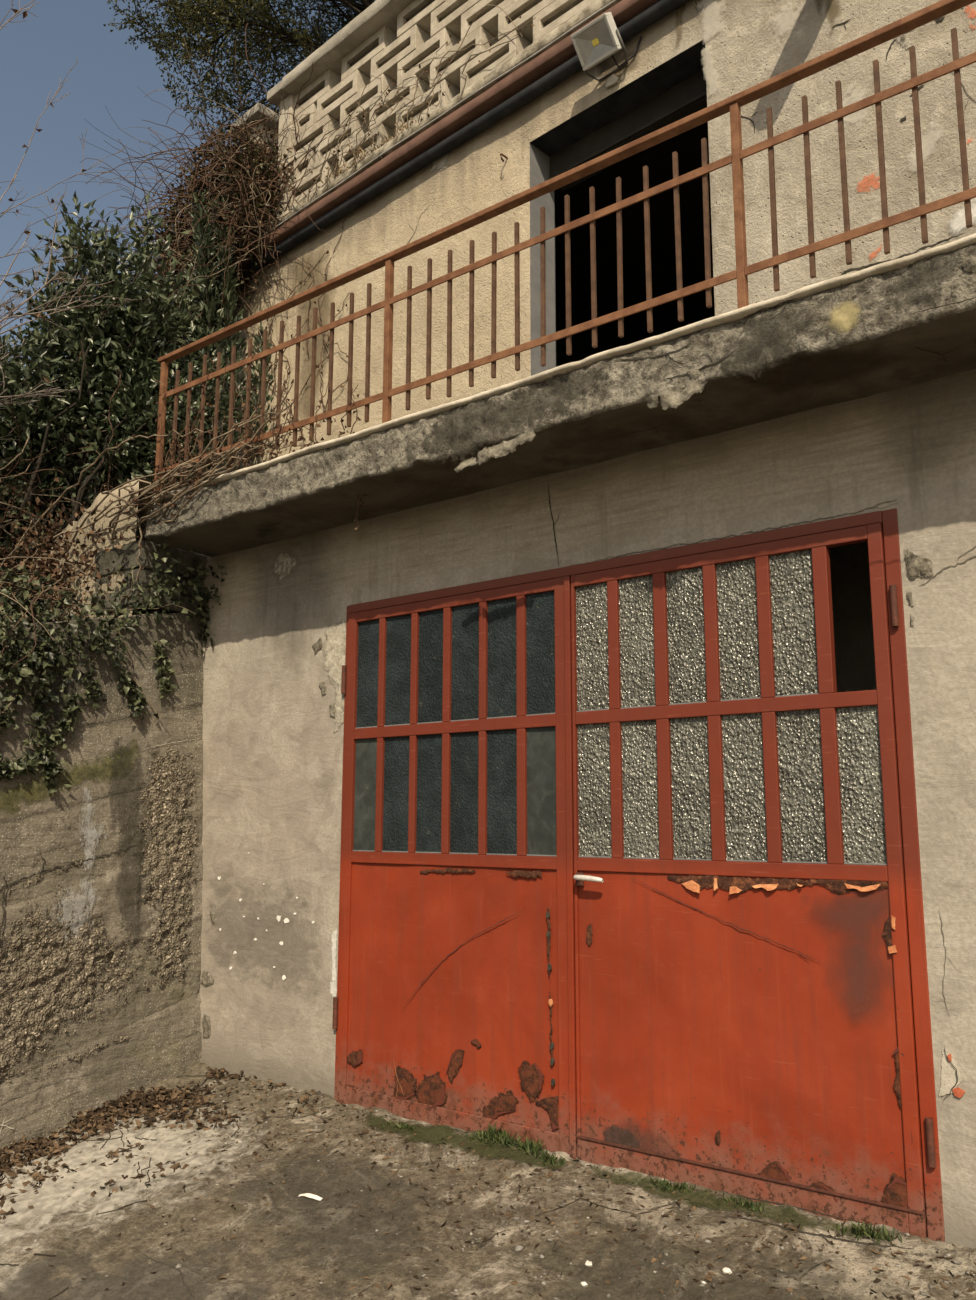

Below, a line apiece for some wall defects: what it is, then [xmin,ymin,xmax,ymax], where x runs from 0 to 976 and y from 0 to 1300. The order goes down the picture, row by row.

damp [816,0,839,20]
spalling [830,302,860,329]
spalling [646,368,707,410]
spalling [454,431,535,472]
crack [547,475,897,565]
crack [919,546,976,586]
peeling [667,875,889,895]
crack [0,842,141,987]